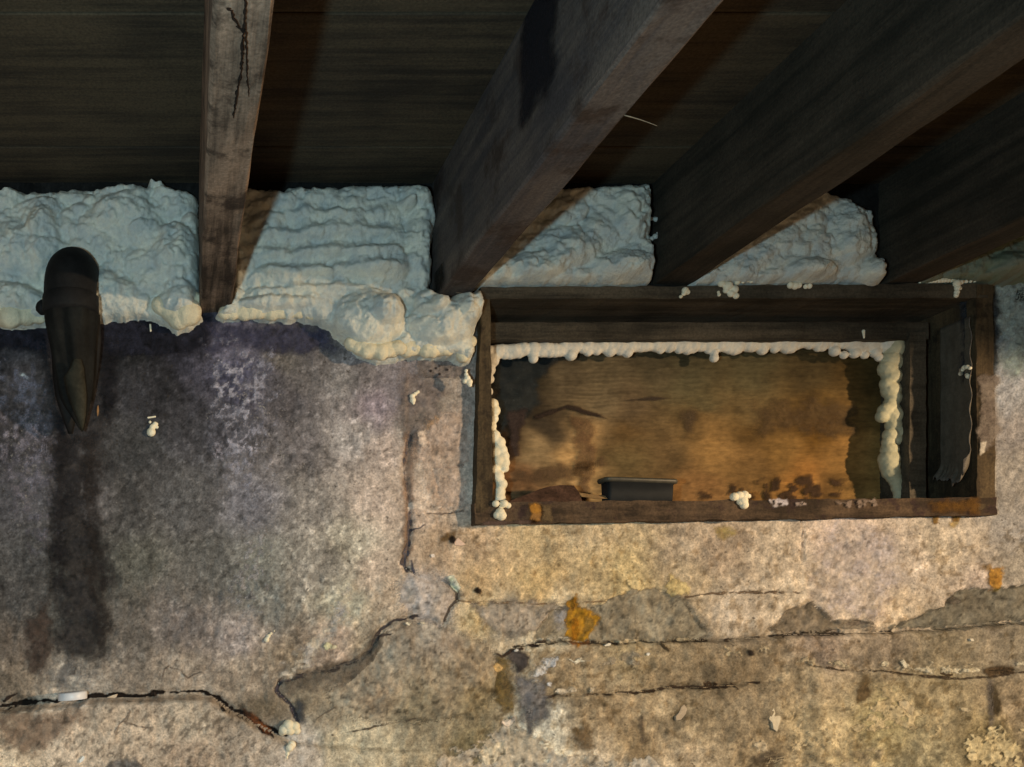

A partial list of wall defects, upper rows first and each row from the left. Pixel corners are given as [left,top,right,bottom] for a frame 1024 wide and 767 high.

leakage [0,348,117,689]
crack [0,434,547,738]
rust [564,597,600,647]
crack [497,620,1024,658]
spalling [889,585,1024,641]
crack [548,681,760,698]
crack [814,665,1024,680]